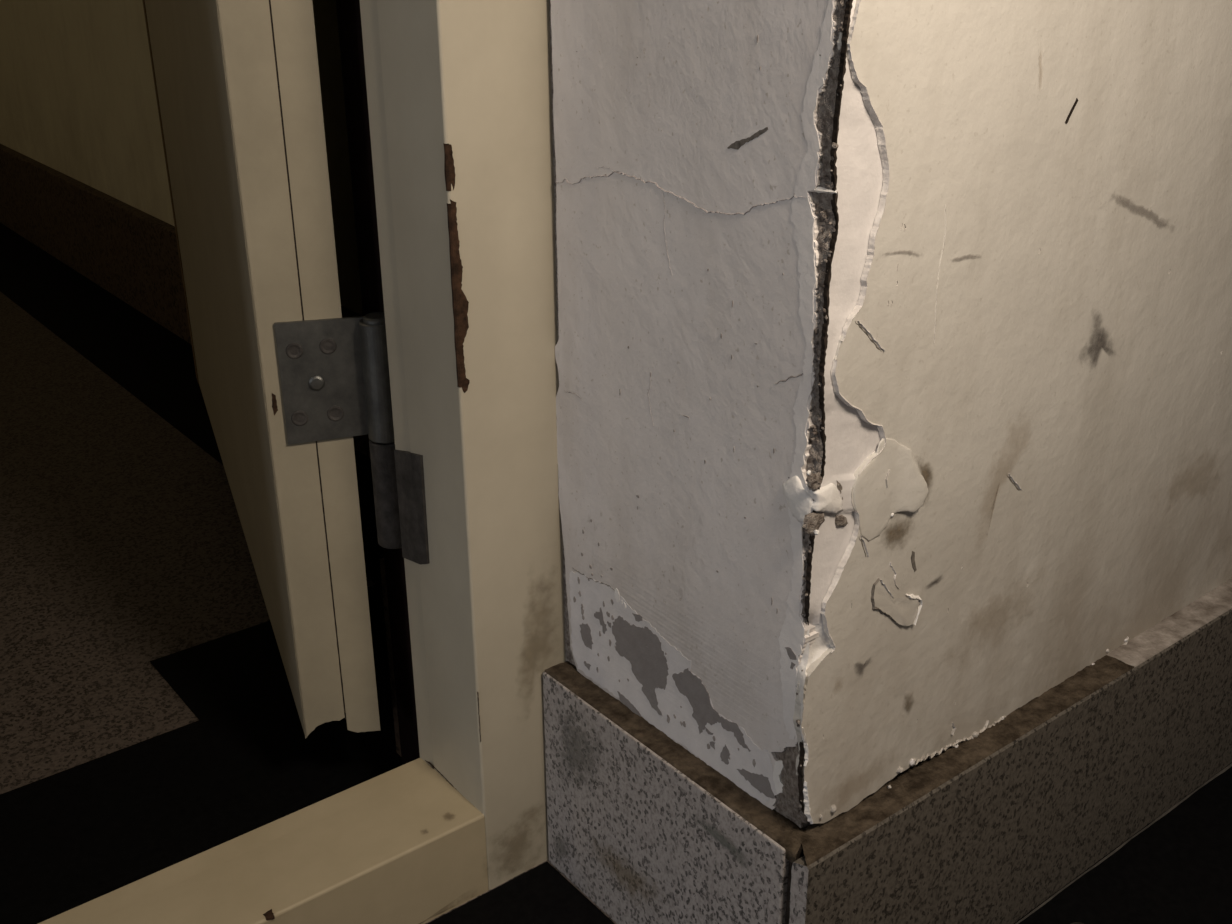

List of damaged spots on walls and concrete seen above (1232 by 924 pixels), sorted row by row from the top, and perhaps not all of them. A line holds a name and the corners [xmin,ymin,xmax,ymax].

spalling [443,143,470,393]
crack [555,166,809,273]
spalling [569,0,890,824]
peeling [871,562,922,626]
spalling [887,716,1006,788]